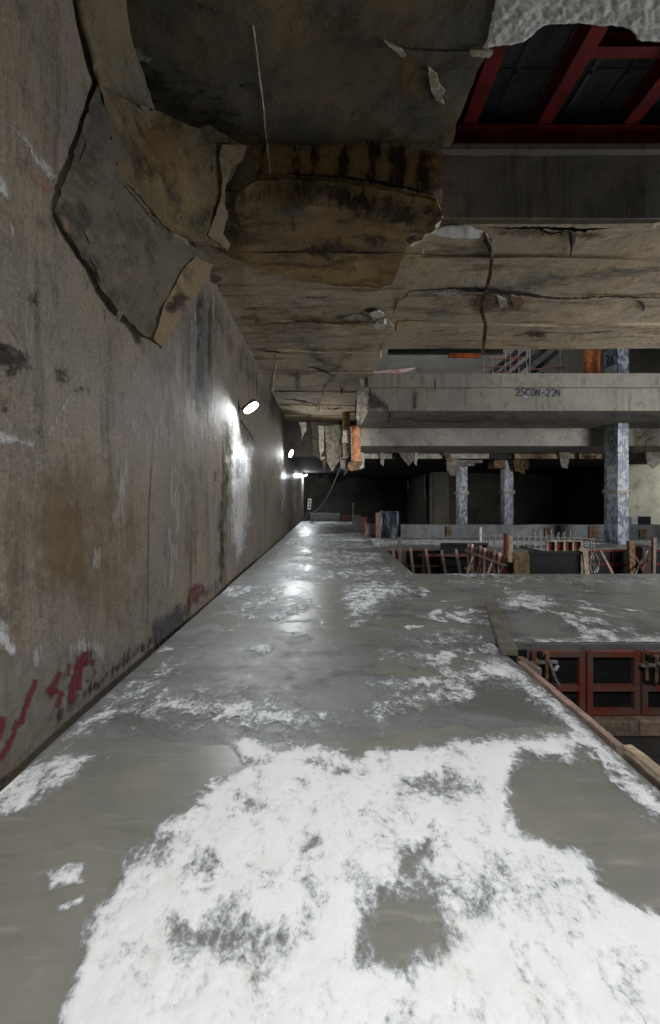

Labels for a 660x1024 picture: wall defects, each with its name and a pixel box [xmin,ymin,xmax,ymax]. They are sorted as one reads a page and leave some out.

damp [224,134,442,247]
crack [236,226,648,261]
crack [395,287,657,343]
damp [161,289,222,588]
peeling [299,377,370,473]
damp [0,416,257,747]